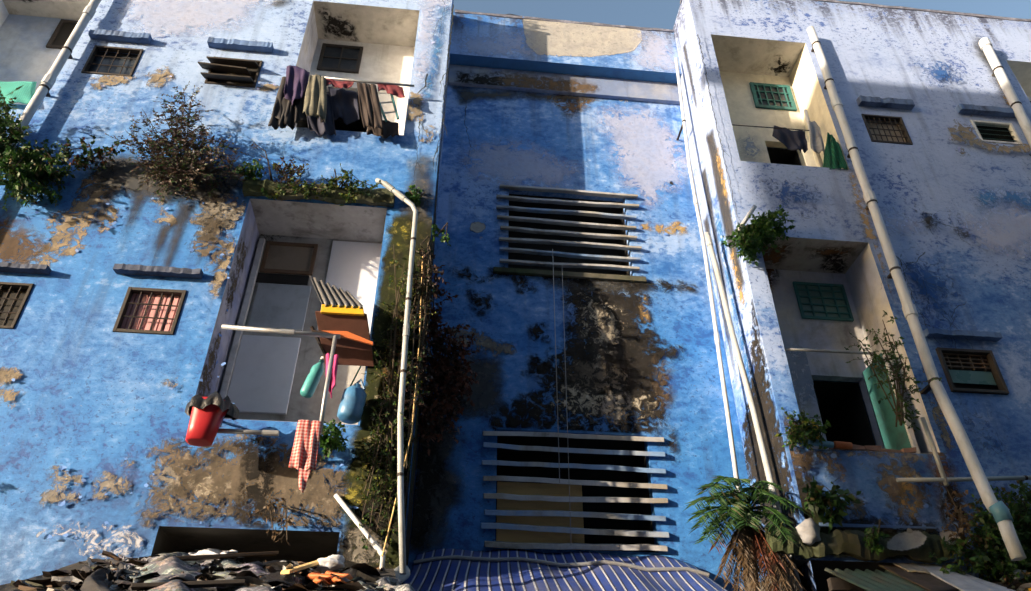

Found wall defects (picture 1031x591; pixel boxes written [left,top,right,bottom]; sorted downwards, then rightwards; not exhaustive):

flaking render [91,67,174,90]
flaking render [948,115,1031,156]
flaking render [34,176,121,266]
flaking render [150,195,176,250]
water stain [90,155,243,266]
flaking render [185,193,248,314]
water stain [338,45,696,563]
flaking render [0,367,23,408]
peeling [198,332,226,396]
spalling [36,434,389,564]
flaking render [816,449,962,551]